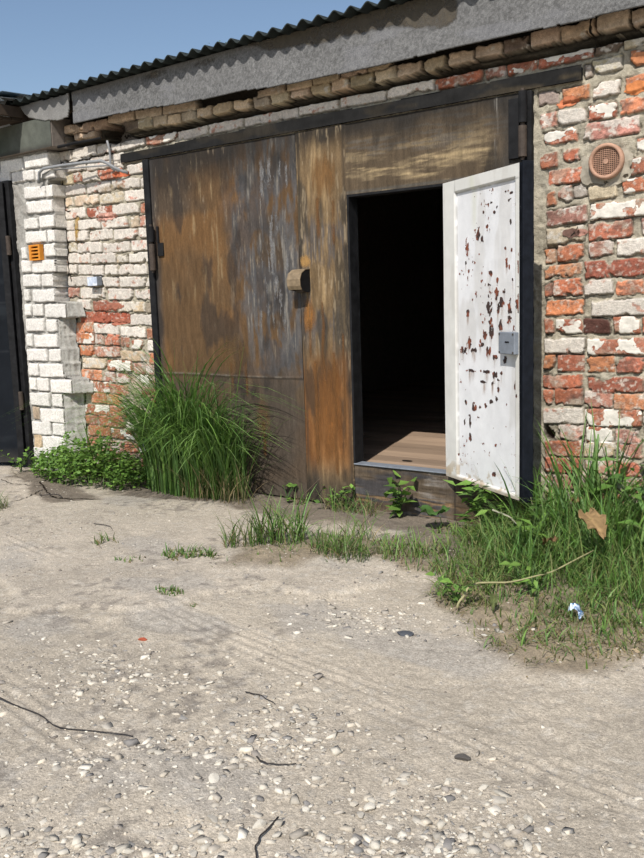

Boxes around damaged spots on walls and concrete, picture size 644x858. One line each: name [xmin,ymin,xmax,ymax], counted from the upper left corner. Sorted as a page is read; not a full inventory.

peeling [535,48,595,63]
spalling [624,80,644,95]
peeling [557,95,617,118]
peeling [149,131,180,142]
peeling [544,127,576,142]
peeling [632,139,644,163]
peeling [562,177,644,238]
corrosion [458,188,519,480]
peeling [556,319,604,355]
peeling [614,316,644,355]
peeling [109,360,149,385]
peeling [585,409,642,443]